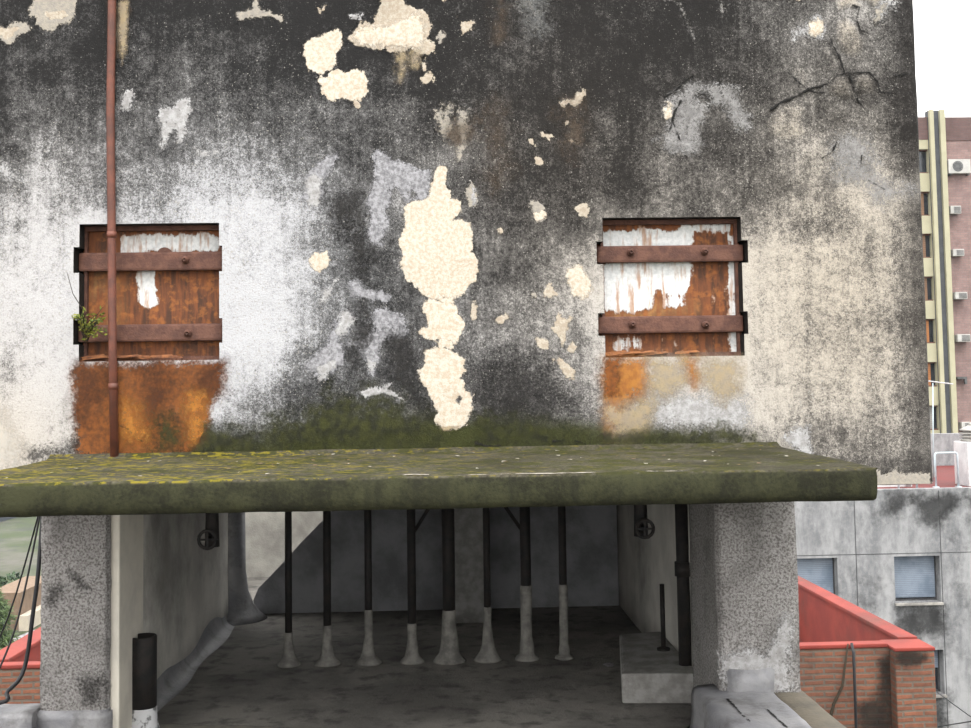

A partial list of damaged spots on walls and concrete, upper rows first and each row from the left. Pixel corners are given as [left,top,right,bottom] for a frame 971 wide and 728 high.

peeling [0,0,77,44]
peeling [158,98,193,149]
peeling [236,0,283,22]
peeling [303,0,446,109]
peeling [559,89,586,108]
spalling [656,82,752,154]
crack [770,41,906,111]
peeling [301,150,479,431]
corrosion [69,359,227,454]
corrosion [601,356,742,437]
efflorescence [644,384,755,435]
damp [885,492,971,527]